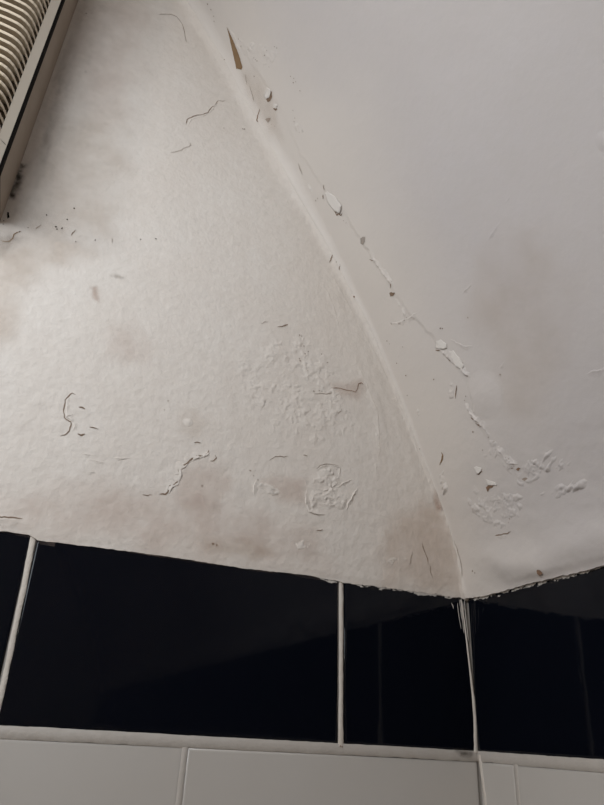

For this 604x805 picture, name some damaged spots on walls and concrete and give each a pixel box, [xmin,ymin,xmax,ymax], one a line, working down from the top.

crack [176,100,220,152]
spalling [264,88,277,125]